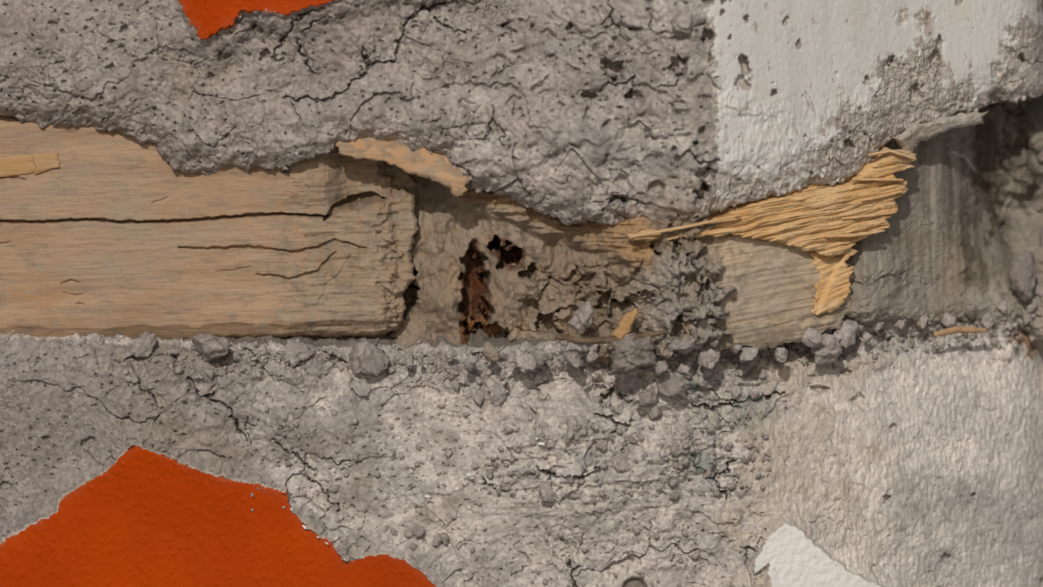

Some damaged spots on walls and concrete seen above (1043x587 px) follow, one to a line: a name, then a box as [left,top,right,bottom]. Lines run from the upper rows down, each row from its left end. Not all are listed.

crack [272,0,467,102]
spalling [0,0,721,226]
crack [475,105,507,145]
peeling [712,0,1043,212]
rust [460,236,525,344]
crack [187,377,340,512]
spalling [0,174,1043,587]
crack [536,466,608,480]
crack [595,413,632,432]
crack [694,458,736,499]
crack [691,392,785,411]
crack [567,556,580,587]